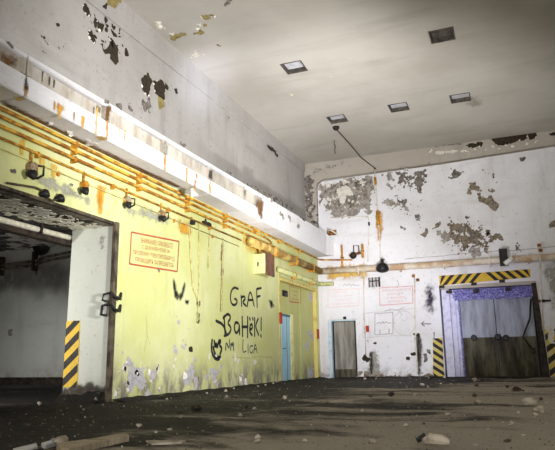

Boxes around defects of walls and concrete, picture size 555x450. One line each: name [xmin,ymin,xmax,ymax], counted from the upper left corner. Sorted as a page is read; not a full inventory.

peeling [82,3,129,65]
peeling [154,14,216,41]
peeling [141,73,178,118]
rust [95,106,111,140]
spalling [428,133,537,155]
peeling [0,194,107,251]
rust [97,186,106,214]
peeling [247,159,504,258]
peeling [118,340,199,396]
peeling [205,353,222,387]